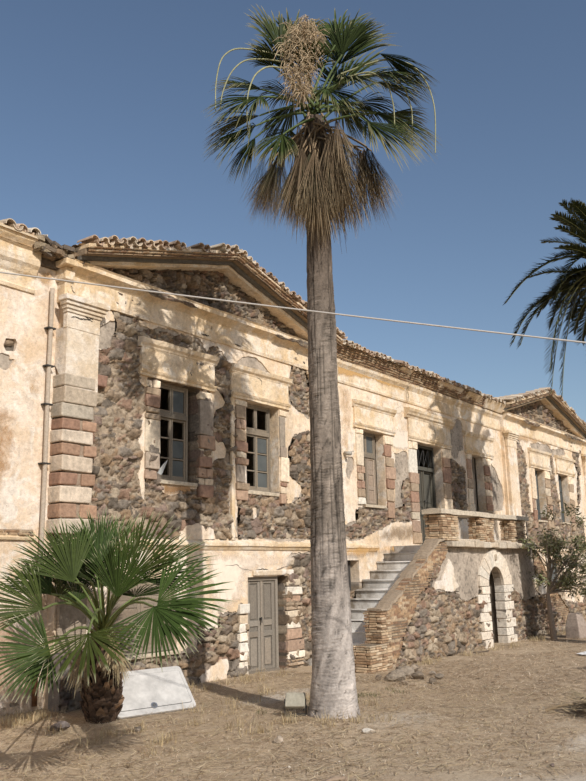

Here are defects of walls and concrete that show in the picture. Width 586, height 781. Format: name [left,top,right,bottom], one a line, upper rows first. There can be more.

peeling [99,310,115,350]
peeling [0,339,14,370]
peeling [210,390,225,413]
peeling [137,410,147,499]
peeling [212,440,226,463]
peeling [271,476,302,504]
peeling [162,487,310,542]
peeling [199,659,229,683]